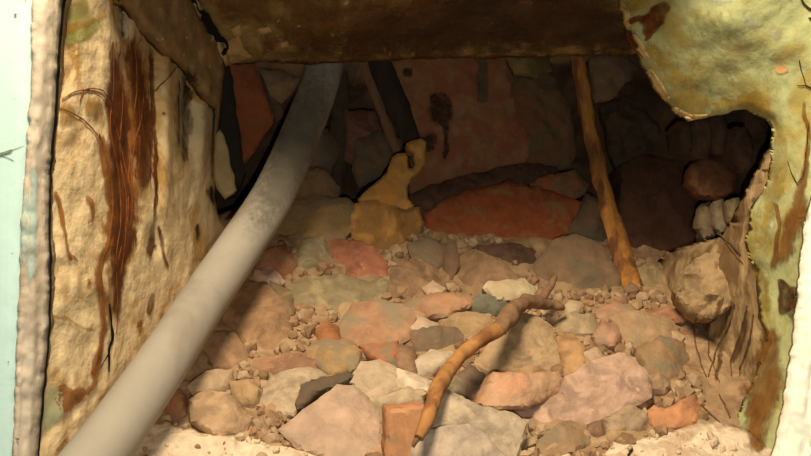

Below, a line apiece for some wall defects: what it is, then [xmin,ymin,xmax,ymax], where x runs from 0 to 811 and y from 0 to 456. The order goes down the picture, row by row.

spalling [221,24,252,66]
corrosion [625,3,670,49]
flaking render [8,0,101,456]
corrosion [53,35,169,413]
peeling [215,129,237,199]
peeling [618,0,811,456]
crack [100,304,114,372]
corrosion [741,329,784,451]